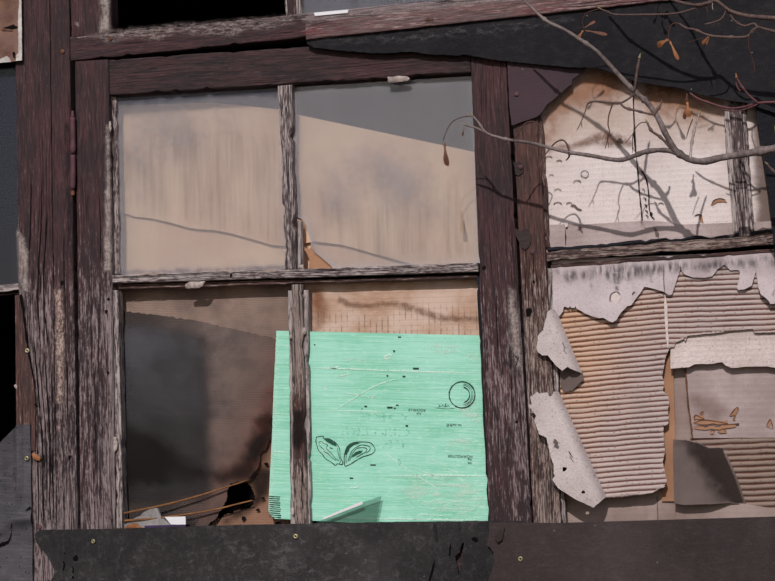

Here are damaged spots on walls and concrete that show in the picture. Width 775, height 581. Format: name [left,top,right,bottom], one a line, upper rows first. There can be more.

leakage [570,71,619,100]
leakage [645,85,695,113]
peeling [528,309,606,508]
peeling [693,407,739,434]